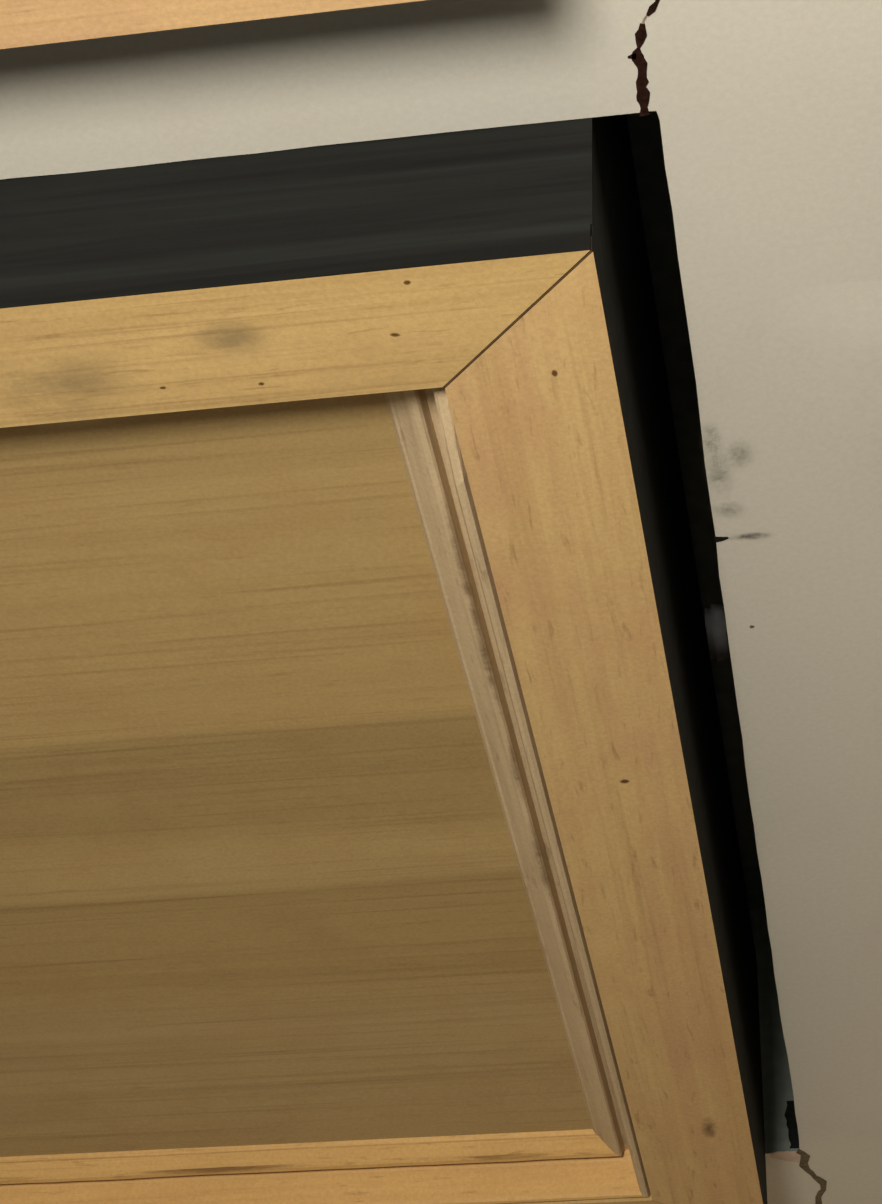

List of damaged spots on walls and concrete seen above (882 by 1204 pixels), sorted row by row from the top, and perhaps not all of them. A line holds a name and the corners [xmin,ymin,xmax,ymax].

crack [628,0,660,117]
crack [784,1100,827,1204]